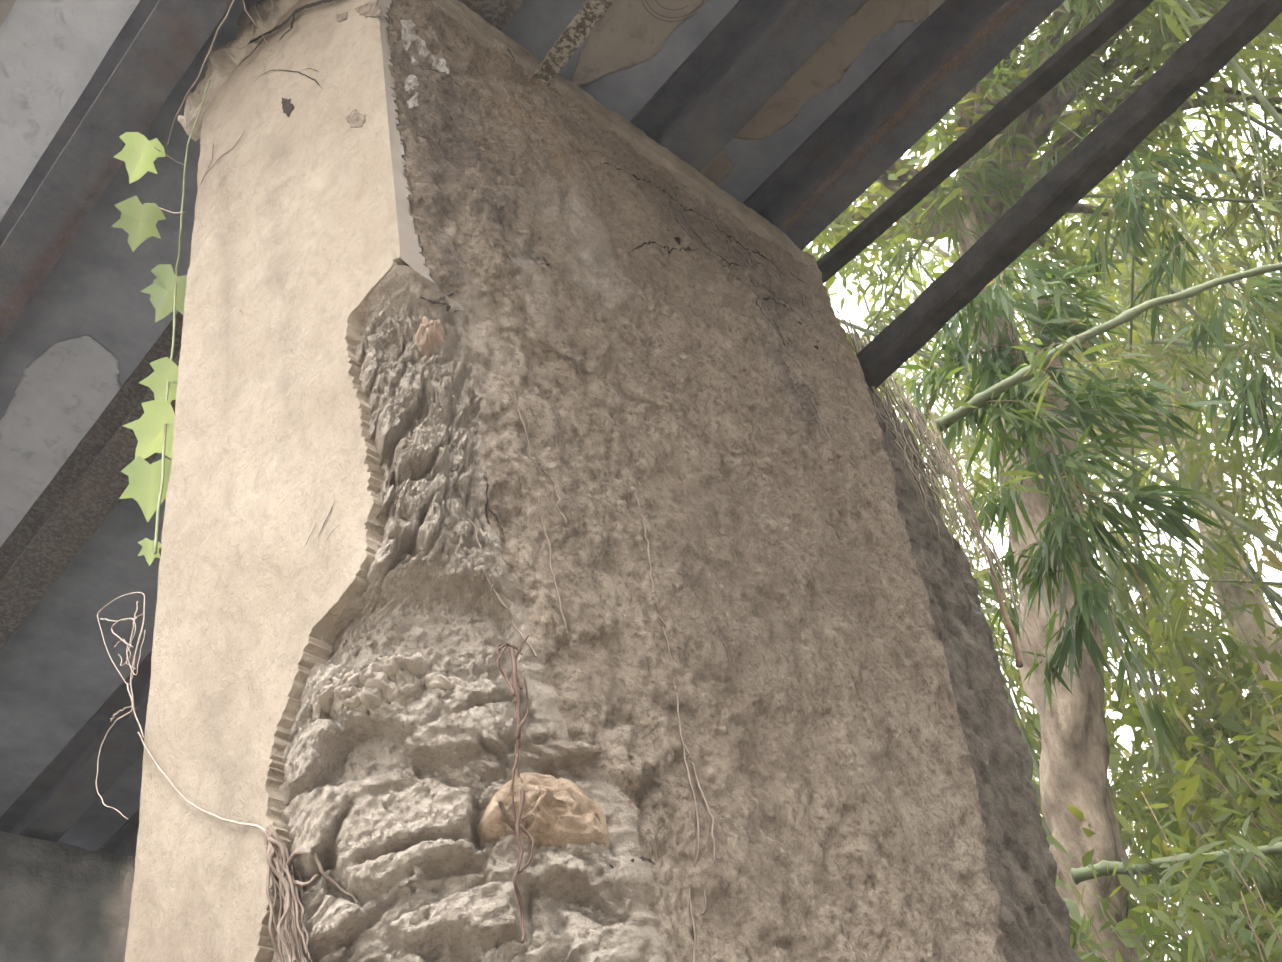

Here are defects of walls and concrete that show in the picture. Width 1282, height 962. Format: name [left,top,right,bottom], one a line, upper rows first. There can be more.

crack [239,0,336,90]
spalling [336,0,383,22]
peeling [399,19,450,109]
spalling [346,109,366,128]
spalling [271,265,667,962]